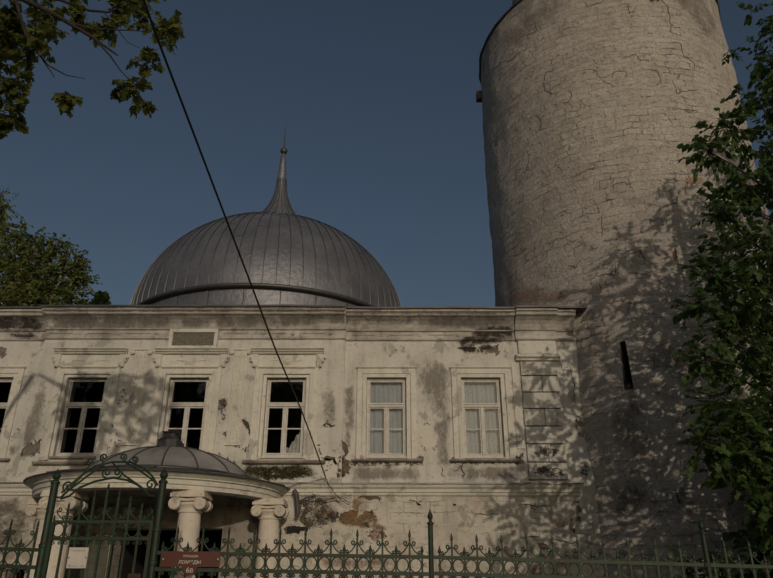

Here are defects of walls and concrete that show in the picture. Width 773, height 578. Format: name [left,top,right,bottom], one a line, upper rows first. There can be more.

crack [581,54,701,113]
crack [598,250,649,304]
water stain [0,316,41,339]
spalling [457,344,500,356]
water stain [422,364,446,410]
peeling [21,439,41,457]
water stain [263,468,301,480]
spalling [533,445,565,477]
spalling [335,496,388,543]